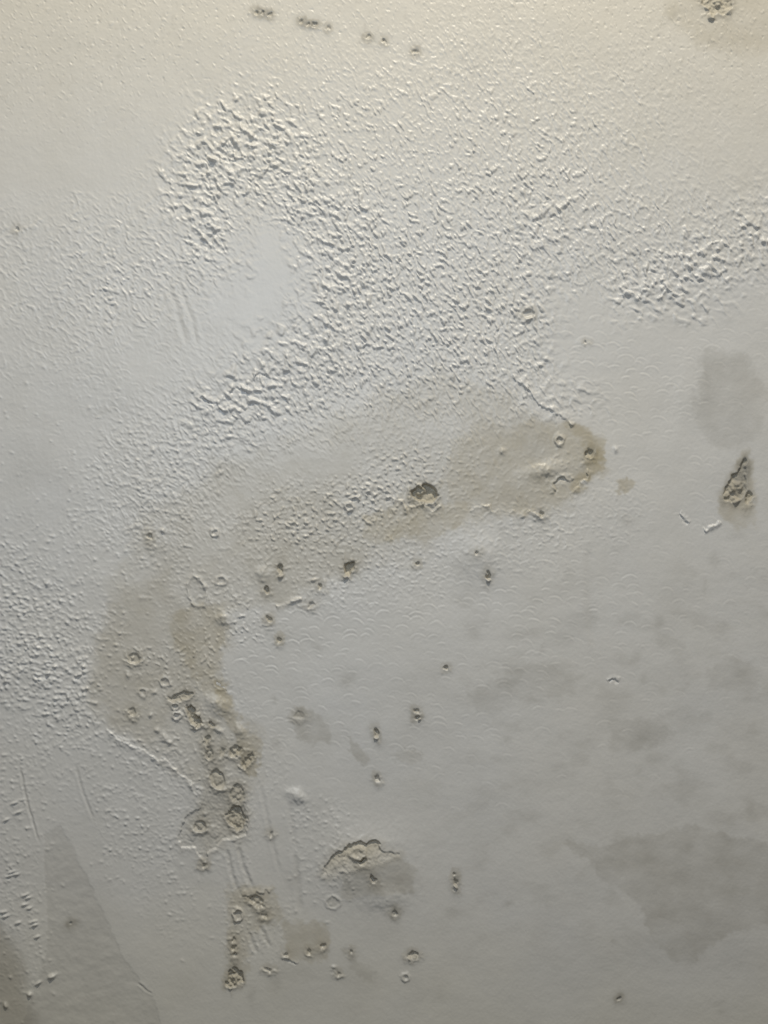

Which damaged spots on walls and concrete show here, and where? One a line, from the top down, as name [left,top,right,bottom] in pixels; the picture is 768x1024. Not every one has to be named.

peeling [383,480,450,520]
peeling [696,452,757,536]
damp [73,359,638,859]
peeling [98,688,258,864]
peeling [318,836,405,881]
peeling [234,883,279,913]
peeling [222,961,247,994]